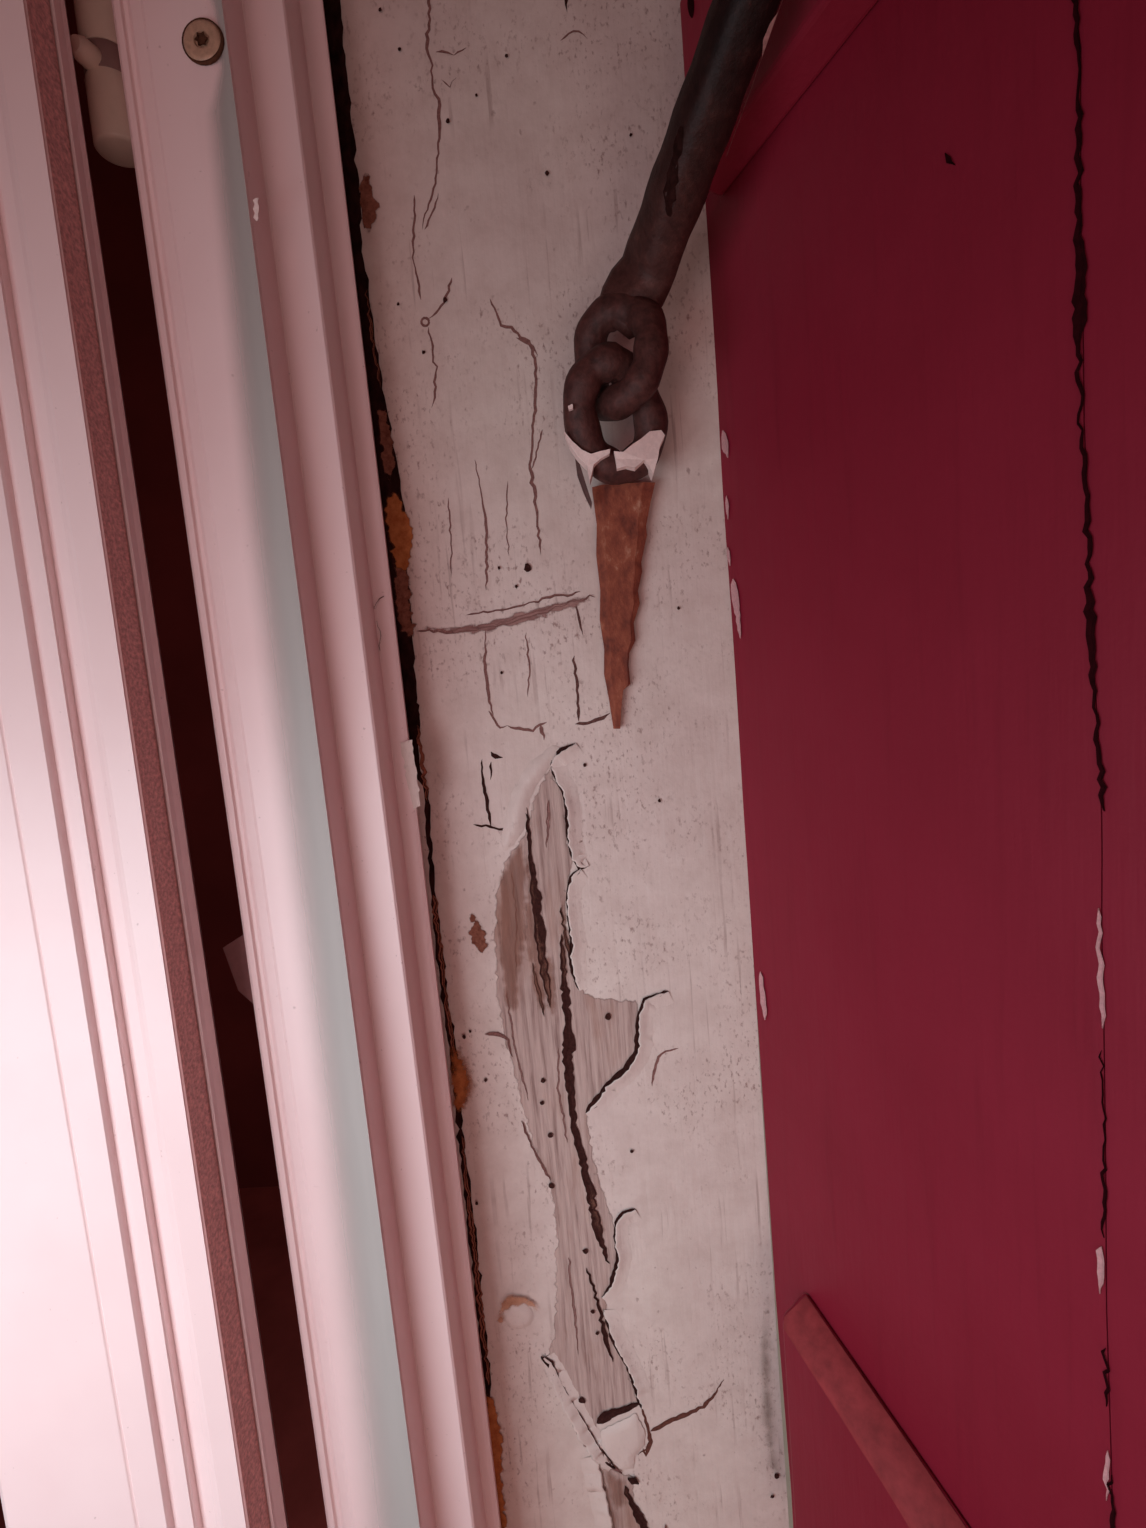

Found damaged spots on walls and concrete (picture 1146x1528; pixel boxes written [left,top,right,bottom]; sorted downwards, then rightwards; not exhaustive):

crack [561,0,586,40]
crack [411,0,465,406]
crack [448,299,542,587]
crack [1071,0,1107,812]
rust [384,493,417,637]
crack [473,607,610,831]
peeling [468,743,674,1528]
crack [1098,1050,1107,1238]
crack [1101,1348,1110,1407]
crack [1106,1475,1116,1528]